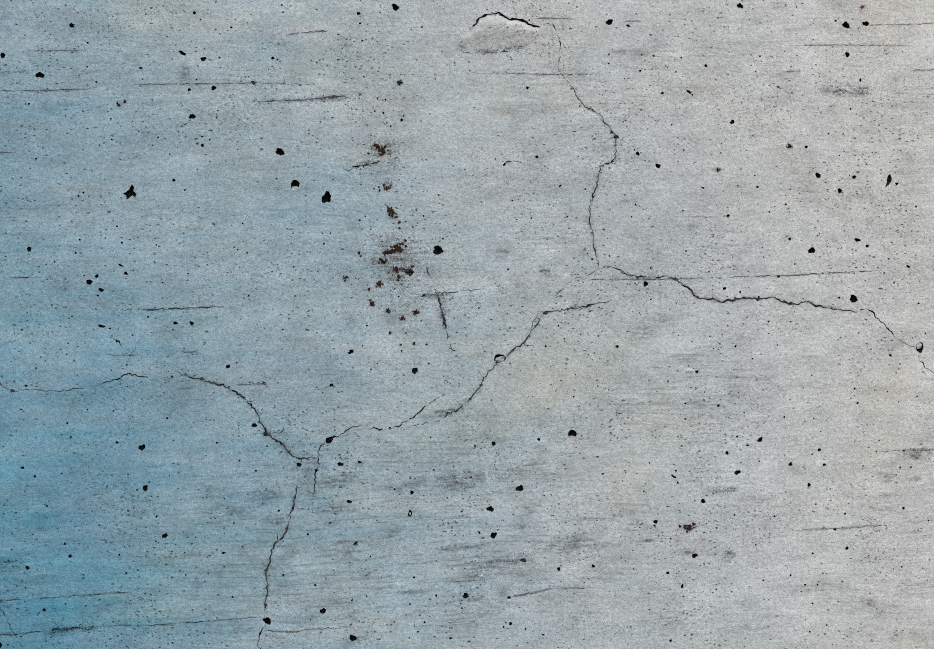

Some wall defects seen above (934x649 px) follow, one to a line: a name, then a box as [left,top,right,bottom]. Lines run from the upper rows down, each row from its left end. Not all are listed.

crack [3,70,90,92]
crack [134,82,356,102]
crack [507,18,934,373]
corrosion [378,239,414,281]
crack [417,267,479,351]
crack [0,301,609,649]